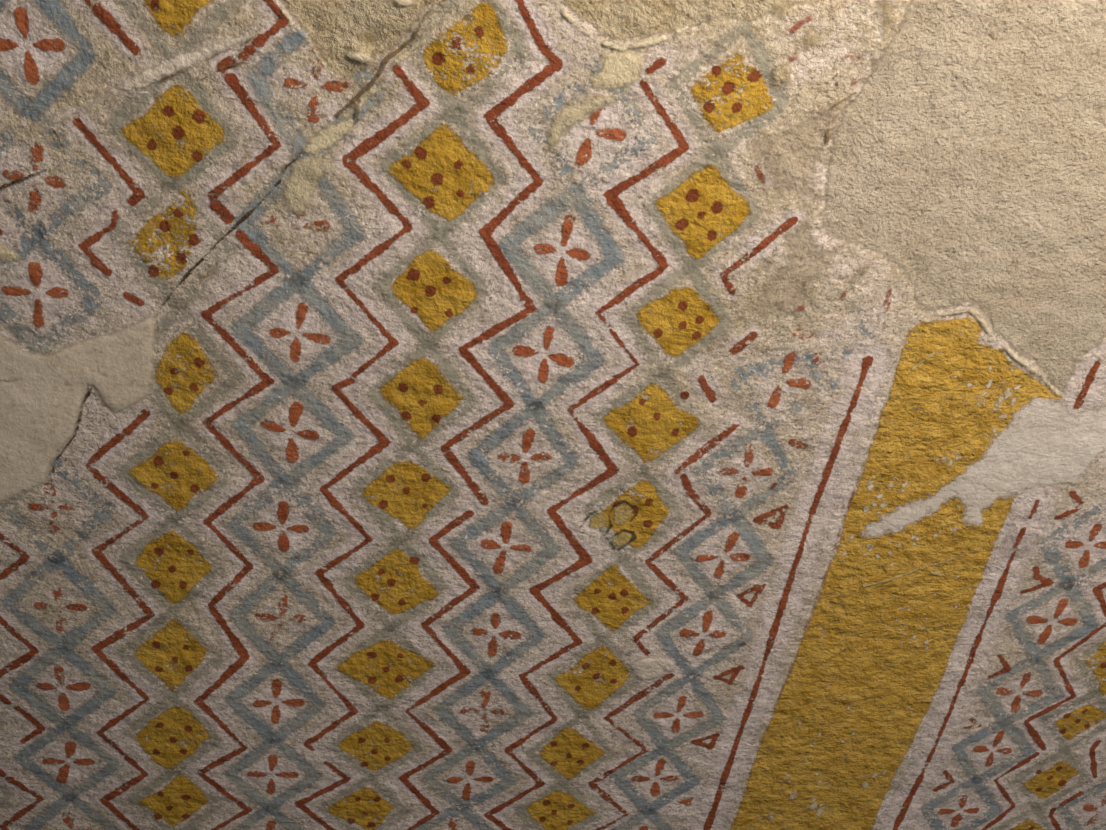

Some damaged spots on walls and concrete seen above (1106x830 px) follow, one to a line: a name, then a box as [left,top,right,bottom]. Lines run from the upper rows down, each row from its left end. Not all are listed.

spalling [561,0,819,51]
crack [160,35,256,81]
crack [336,0,443,123]
crack [157,144,299,333]
peeling [962,366,1021,437]
peeling [863,476,908,514]
spalling [585,500,638,550]
peeling [848,534,919,559]